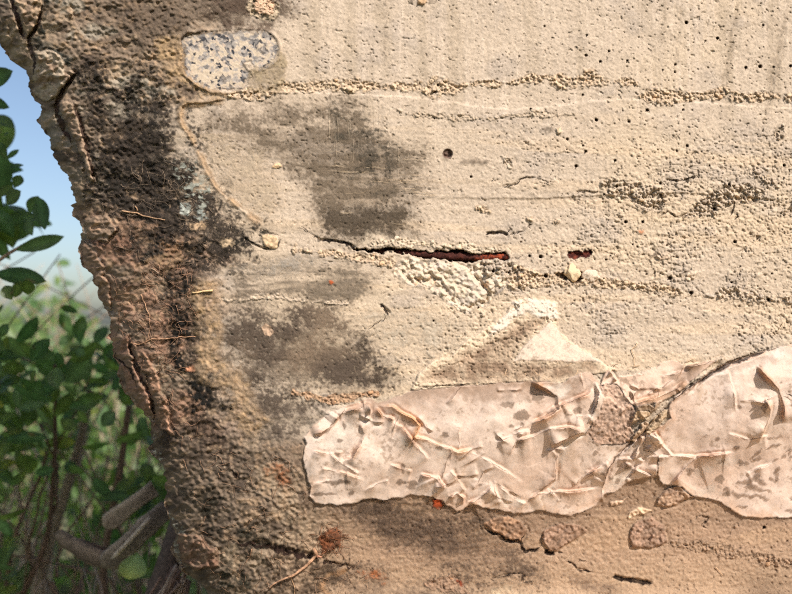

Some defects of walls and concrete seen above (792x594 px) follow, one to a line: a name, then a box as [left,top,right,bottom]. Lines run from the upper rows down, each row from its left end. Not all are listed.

leakage [72,0,424,439]
crack [241,230,283,250]
crack [301,224,531,263]
rust [374,250,509,261]
peeling [411,299,617,390]
spalling [628,486,693,519]